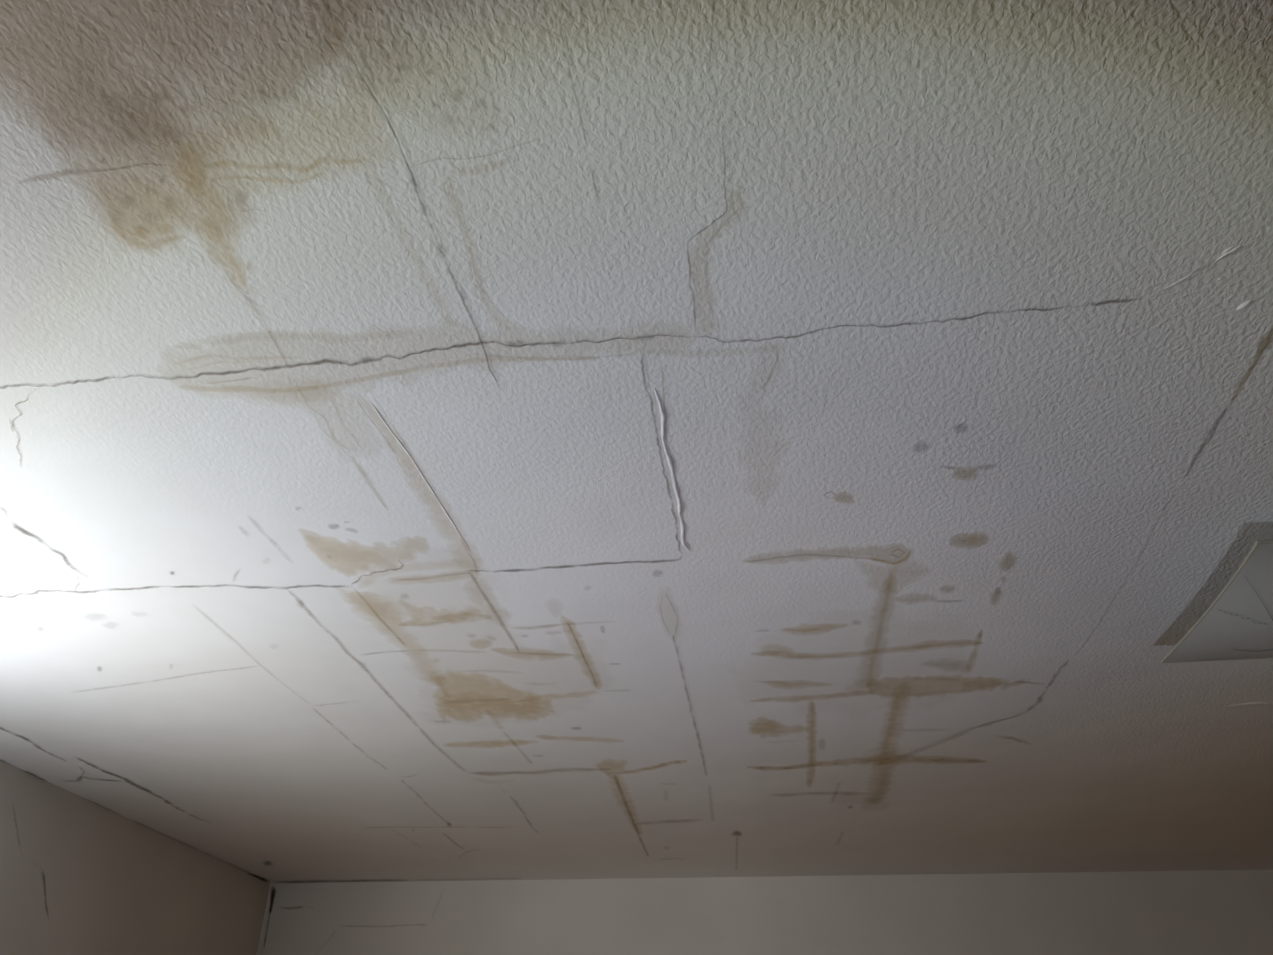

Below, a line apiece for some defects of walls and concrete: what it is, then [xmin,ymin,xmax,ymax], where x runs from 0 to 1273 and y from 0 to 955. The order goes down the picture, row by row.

crack [16,528,69,565]